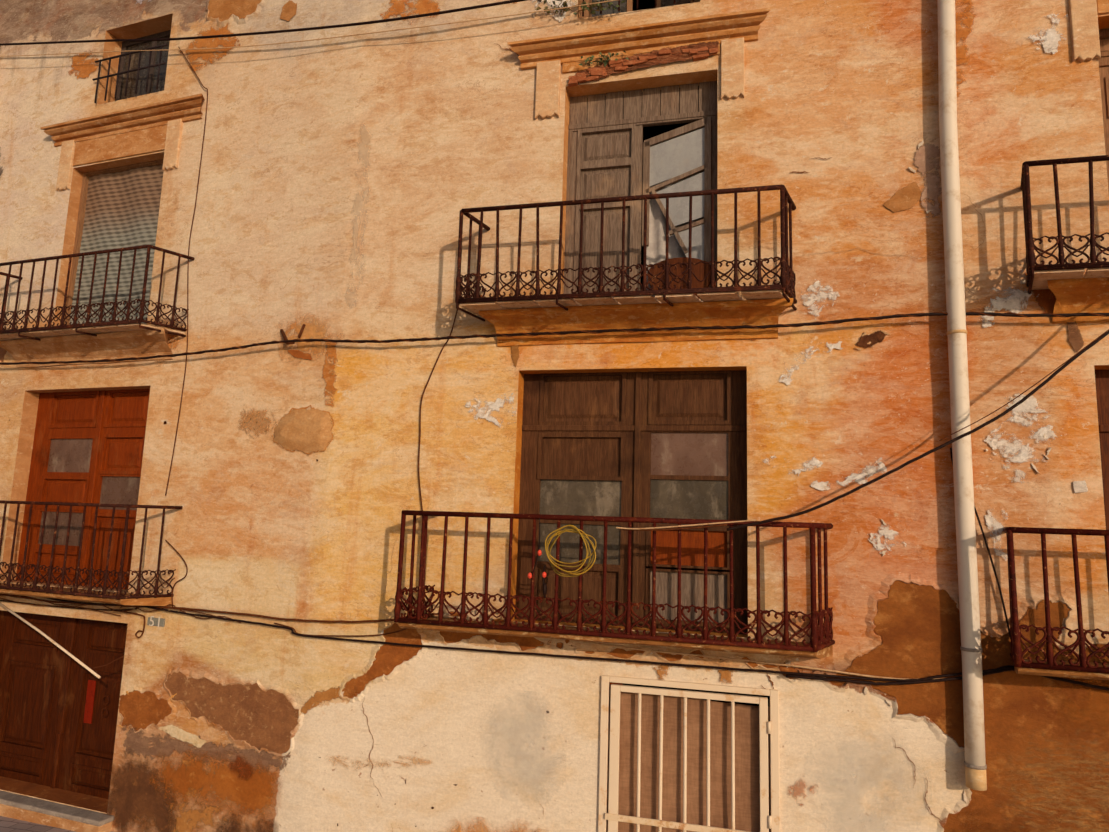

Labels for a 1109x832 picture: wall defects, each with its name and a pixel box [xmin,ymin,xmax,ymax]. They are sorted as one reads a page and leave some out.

flaking render [179,0,270,72]
flaking render [280,0,297,21]
peeling [532,0,575,22]
peeling [984,394,1062,483]
damp [104,724,290,832]
crack [362,703,383,798]
flaking render [118,572,965,759]
flaking render [936,593,1109,832]